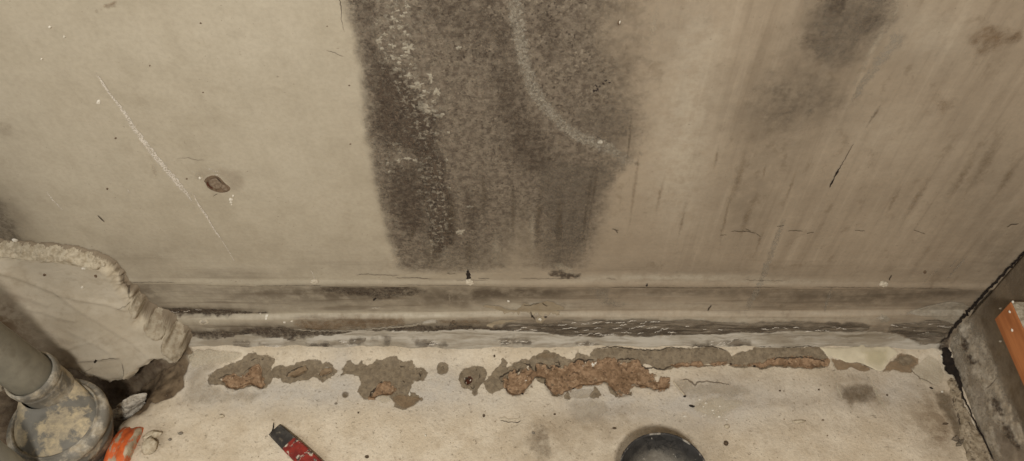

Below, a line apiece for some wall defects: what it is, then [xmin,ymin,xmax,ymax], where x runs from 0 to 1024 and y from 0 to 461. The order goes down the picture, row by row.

damp [348,0,630,279]
spalling [0,240,106,270]
spalling [128,291,189,363]
damp [163,308,267,316]
crack [940,252,1024,458]